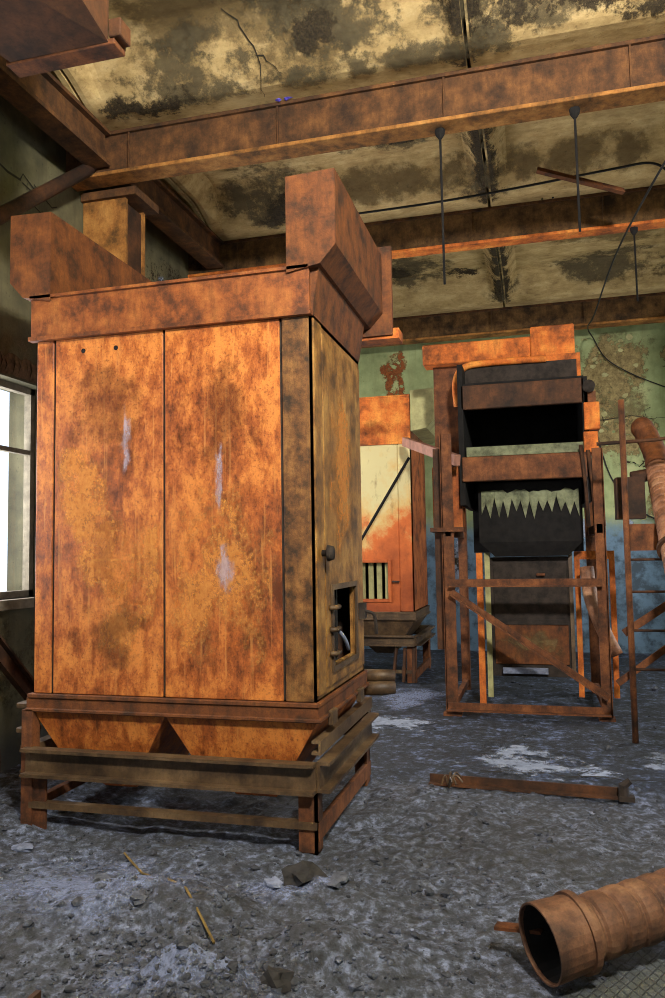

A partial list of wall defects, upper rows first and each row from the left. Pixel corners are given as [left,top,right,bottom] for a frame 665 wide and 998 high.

damp [99,0,665,120]
damp [212,164,296,229]
damp [340,127,649,205]
damp [392,246,519,302]
damp [555,229,665,285]
peeling [575,333,665,467]